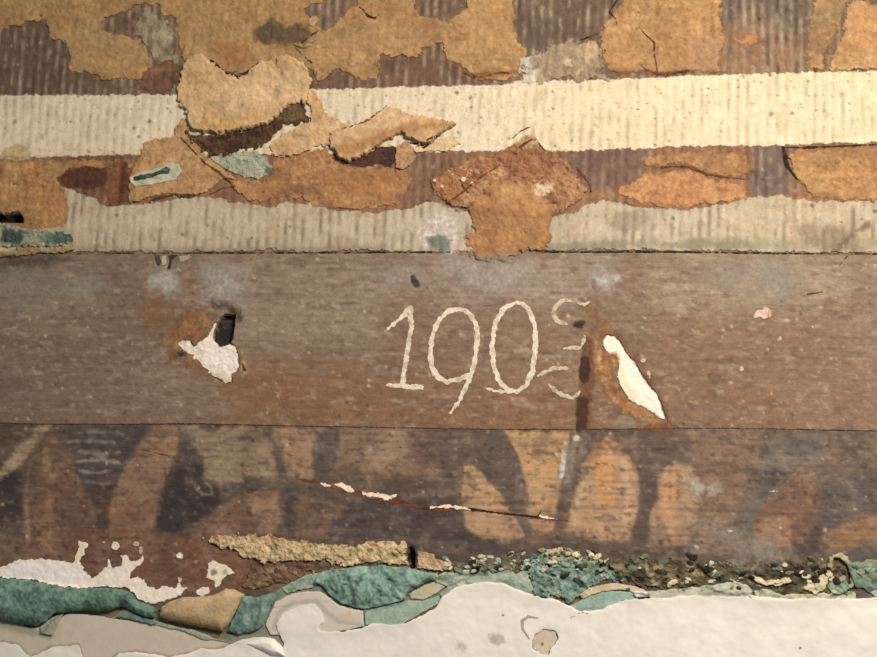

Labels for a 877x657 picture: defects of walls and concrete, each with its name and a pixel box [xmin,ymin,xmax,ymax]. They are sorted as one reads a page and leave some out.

flaking render [805,0,877,71]
flaking render [0,0,759,257]
flaking render [788,145,877,202]
flaking render [163,300,248,383]
flaking render [588,322,672,432]
crack [297,478,568,521]
flaking render [0,532,449,656]
peeling [521,547,877,617]
peeling [521,615,557,655]